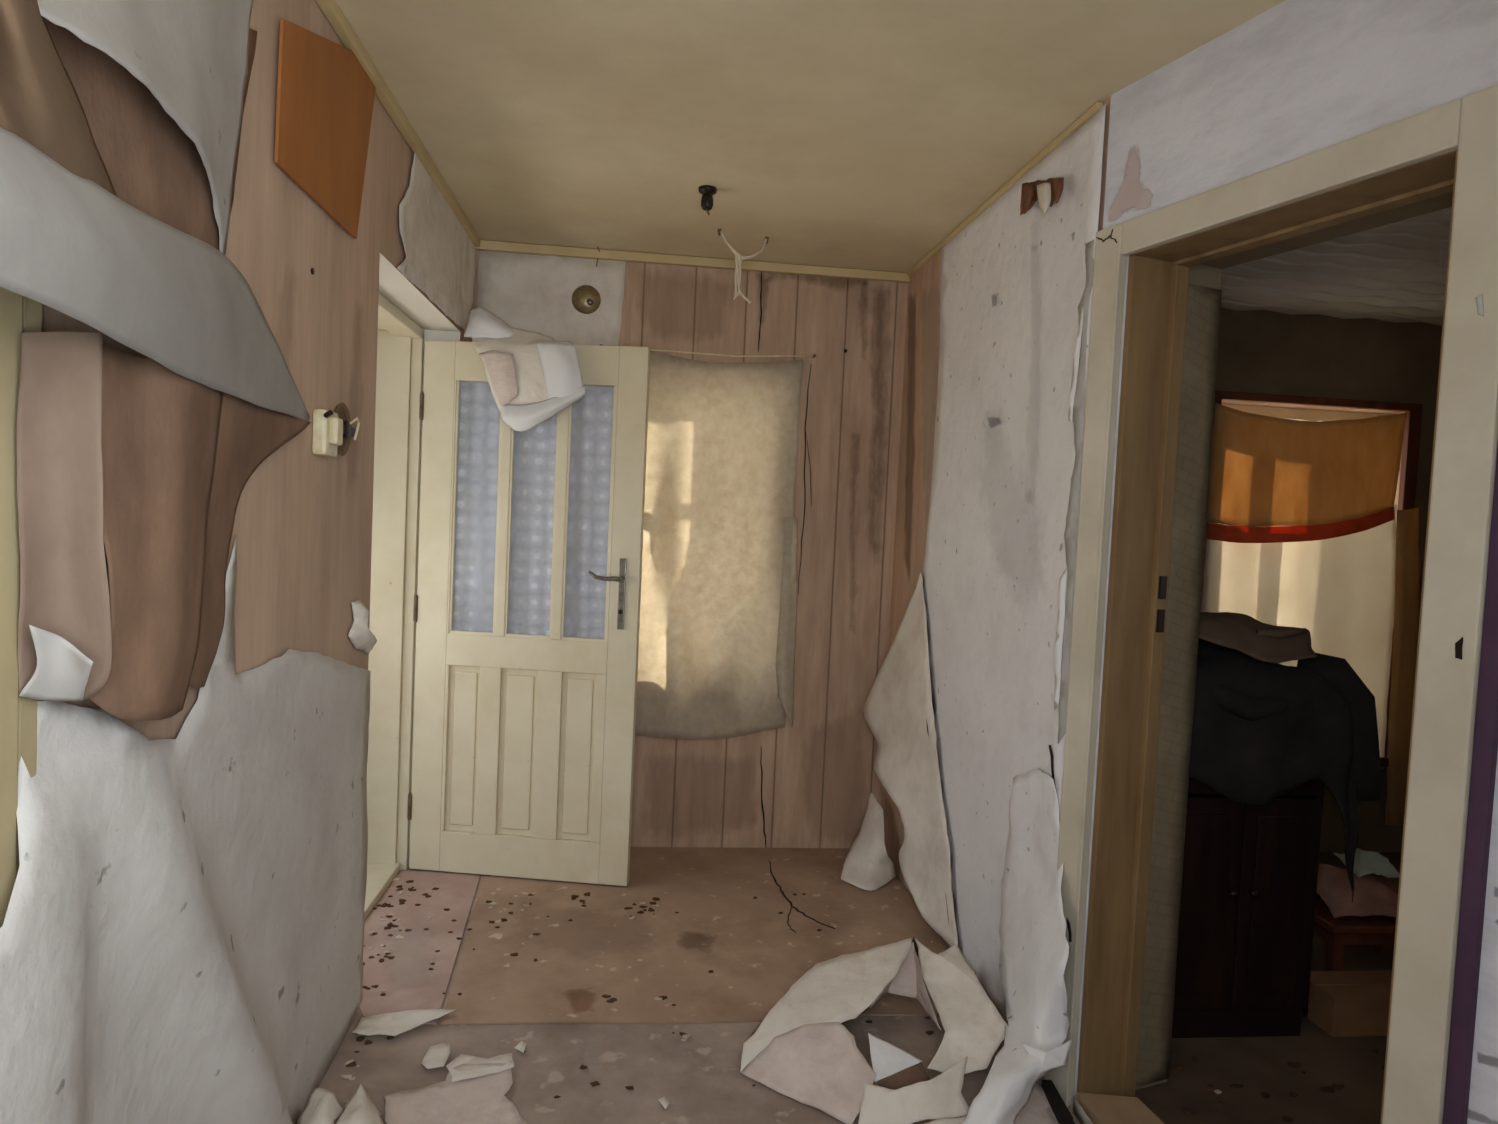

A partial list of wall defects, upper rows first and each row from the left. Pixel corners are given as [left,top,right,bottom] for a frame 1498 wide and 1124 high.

peeling [348,599,377,654]